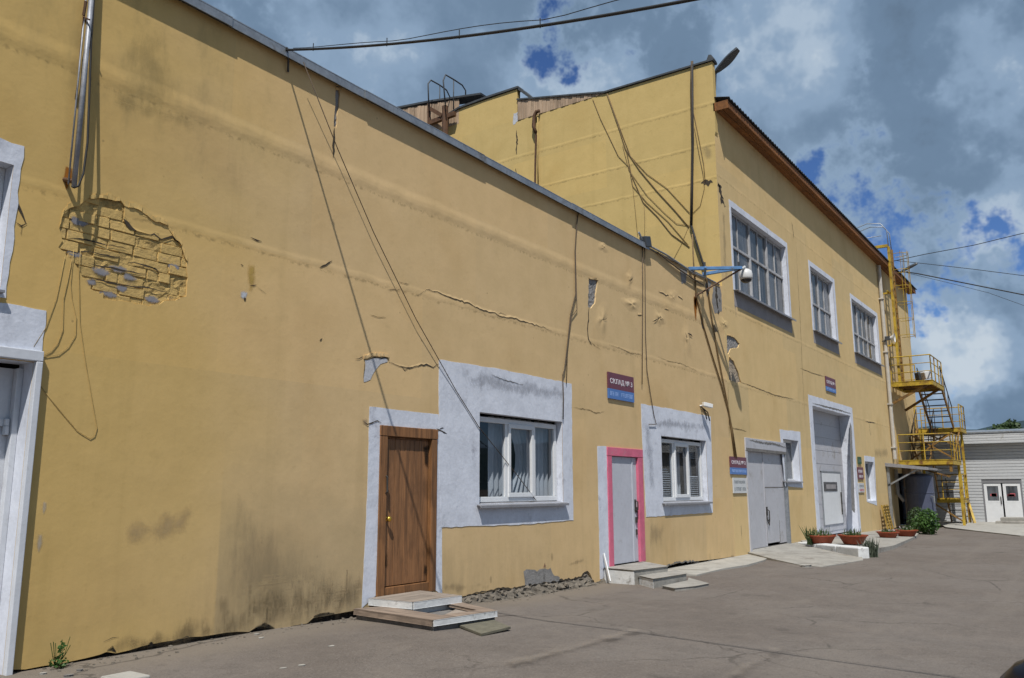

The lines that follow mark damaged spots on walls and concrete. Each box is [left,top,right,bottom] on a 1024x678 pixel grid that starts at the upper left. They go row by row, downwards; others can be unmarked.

flaking render [59,193,188,306]
crack [390,282,547,329]
flaking render [587,277,598,345]
flaking render [359,353,389,382]
flaking render [727,334,740,383]
flaking render [462,565,606,604]
crack [308,611,356,623]
crack [13,622,274,672]